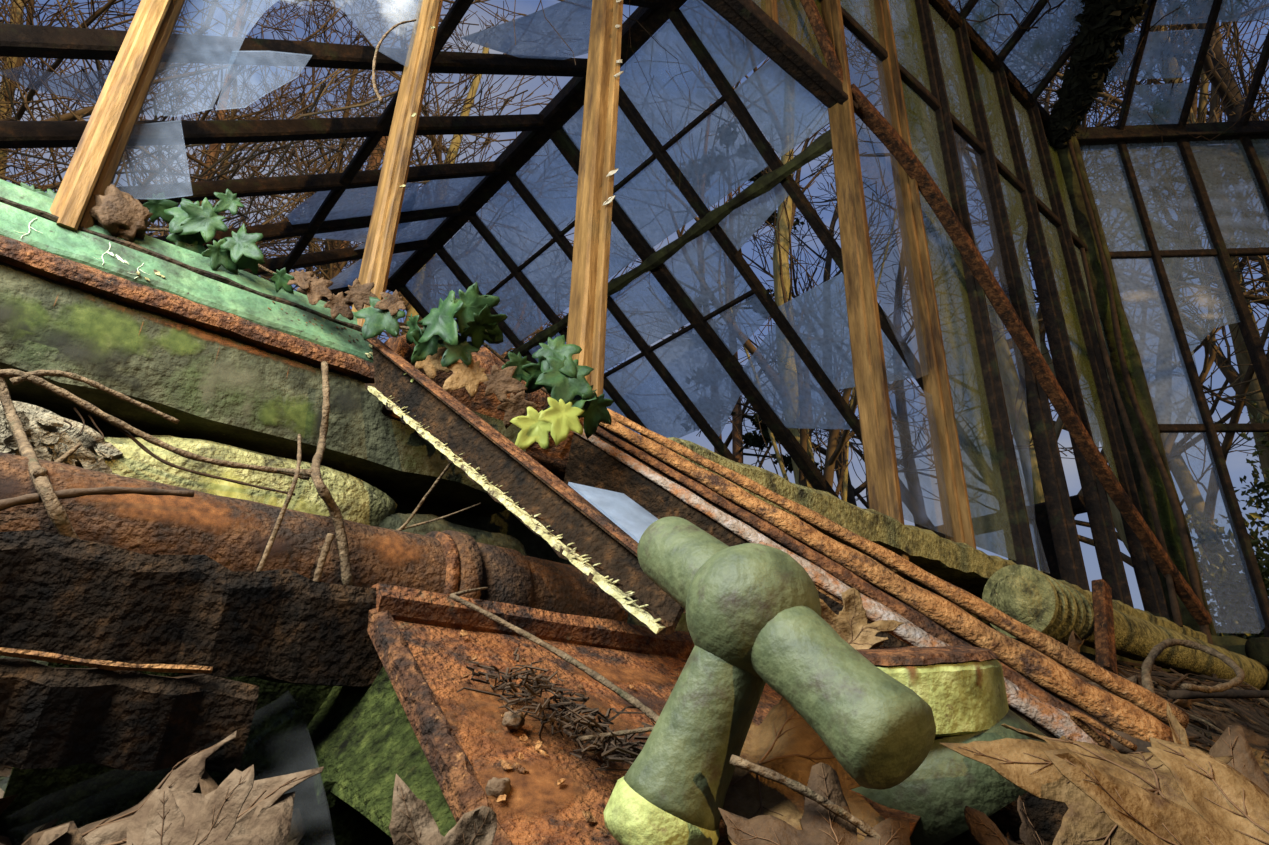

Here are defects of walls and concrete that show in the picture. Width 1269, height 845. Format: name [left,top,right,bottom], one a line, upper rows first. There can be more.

corrosion [140,319,267,359]
corrosion [102,485,232,527]
corrosion [372,536,418,563]